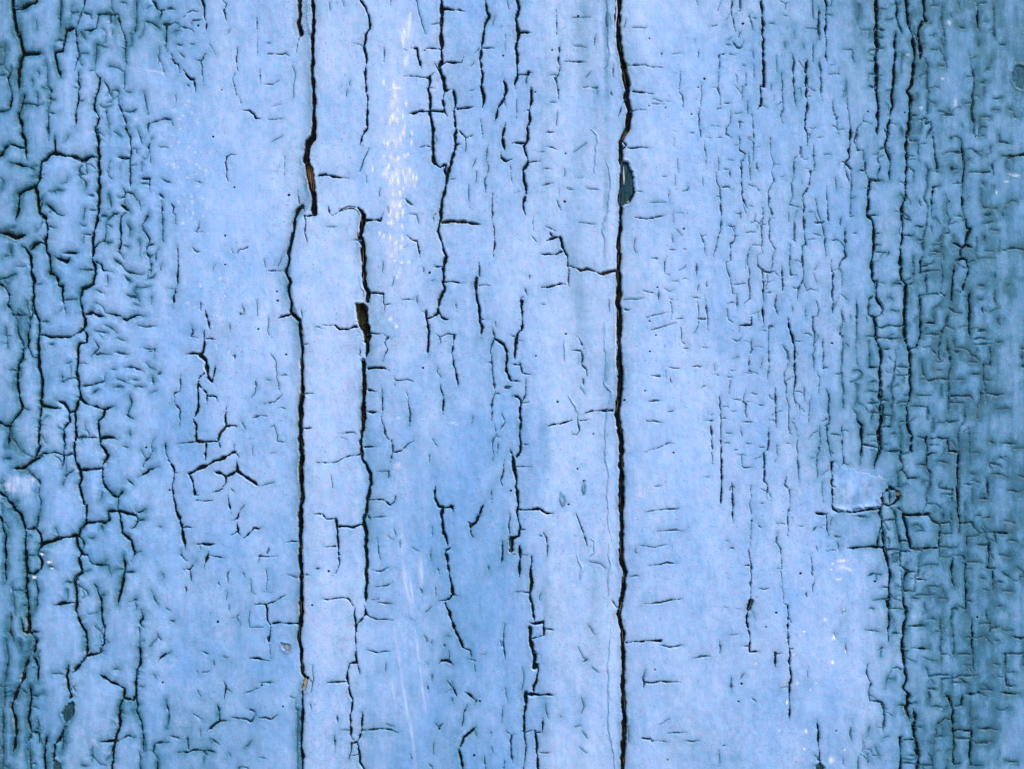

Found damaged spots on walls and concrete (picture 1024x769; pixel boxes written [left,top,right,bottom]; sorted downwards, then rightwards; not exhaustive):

crack [0,0,485,769]
peeling [618,161,635,206]
crack [404,0,1024,769]
peeling [831,464,900,513]